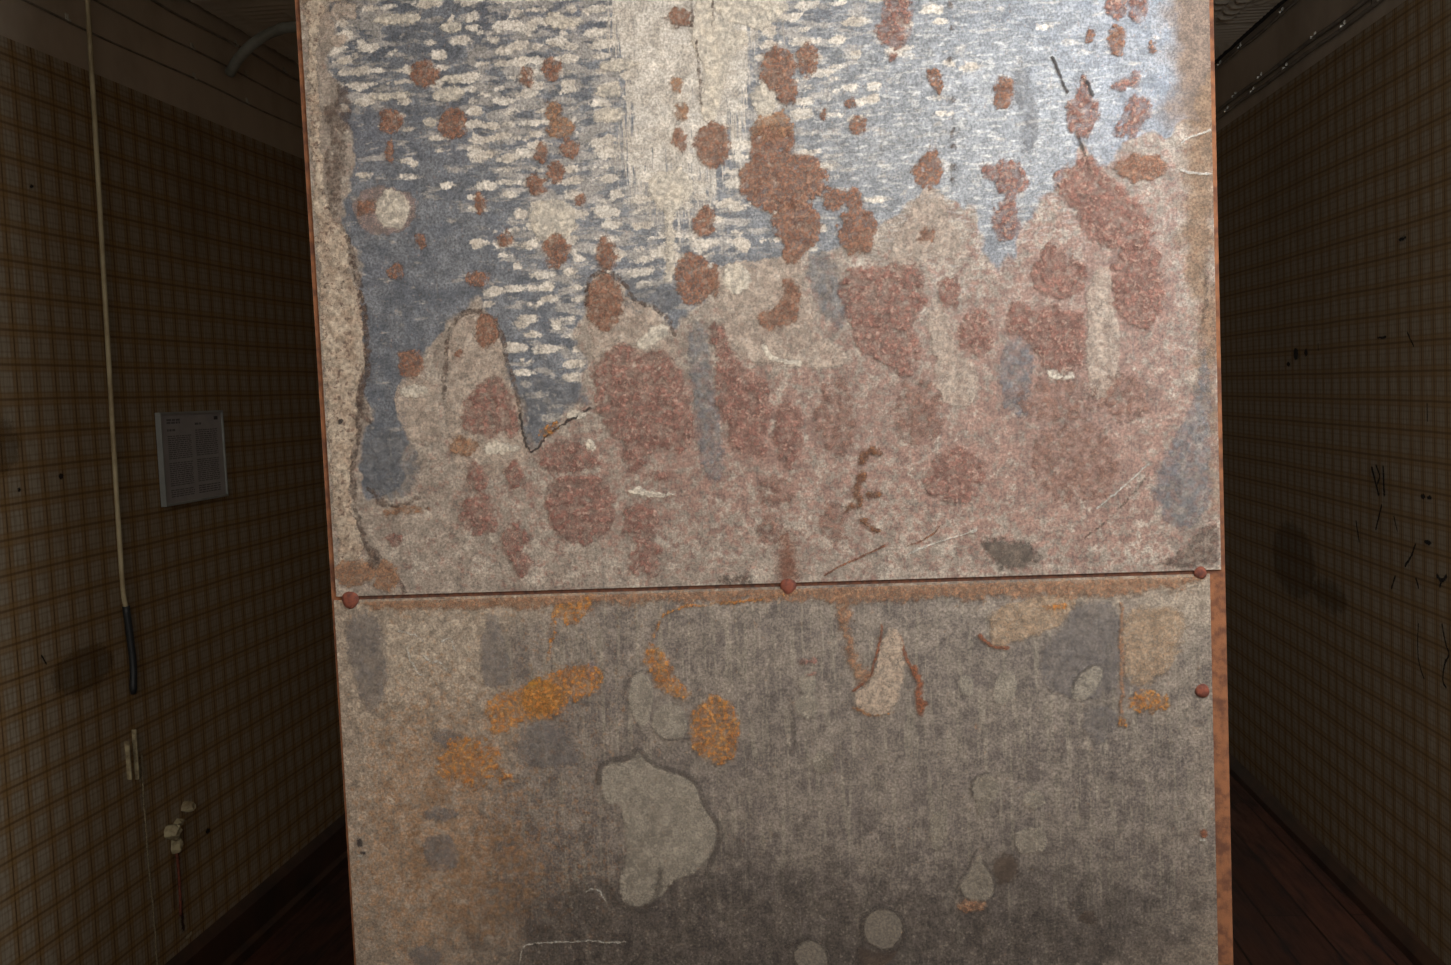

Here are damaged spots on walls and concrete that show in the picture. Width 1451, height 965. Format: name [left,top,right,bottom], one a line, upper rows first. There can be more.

rust [1085,0,1148,56]
peeling [303,0,421,566]
peeling [394,308,528,479]
peeling [584,270,678,390]
rust [670,42,1150,504]
rust [1053,70,1168,329]
rust [334,322,1220,791]
peeling [852,624,905,715]
damp [988,594,1189,714]
damp [601,753,716,906]
damp [794,940,828,965]
damp [857,908,903,965]